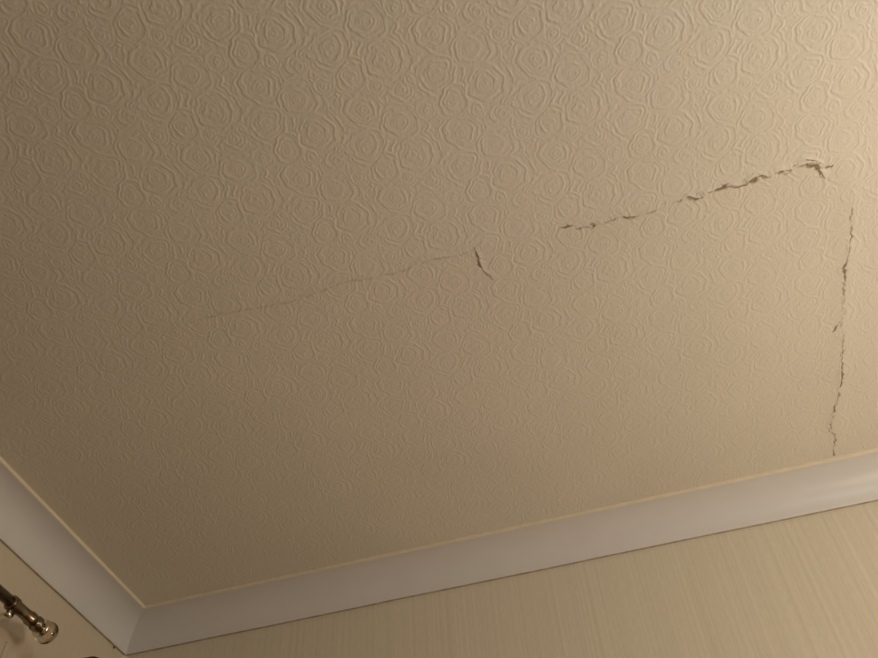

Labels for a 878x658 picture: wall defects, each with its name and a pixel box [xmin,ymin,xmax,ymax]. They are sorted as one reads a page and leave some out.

crack [557,155,833,229]
crack [825,188,853,456]